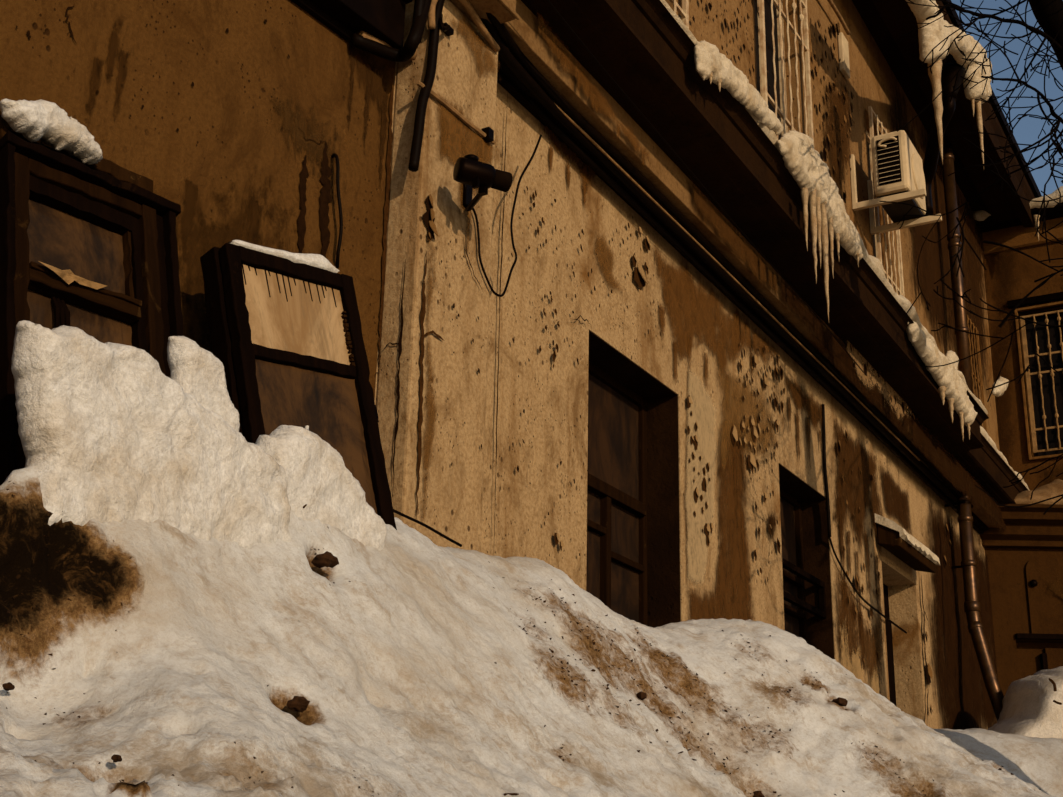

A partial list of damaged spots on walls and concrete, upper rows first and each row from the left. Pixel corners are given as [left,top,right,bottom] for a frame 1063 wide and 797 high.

damp [86,19,129,117]
damp [274,46,388,204]
peeling [685,371,716,583]
damp [655,248,777,620]
peeling [731,343,786,480]
peeling [754,490,781,582]
damp [834,418,912,695]